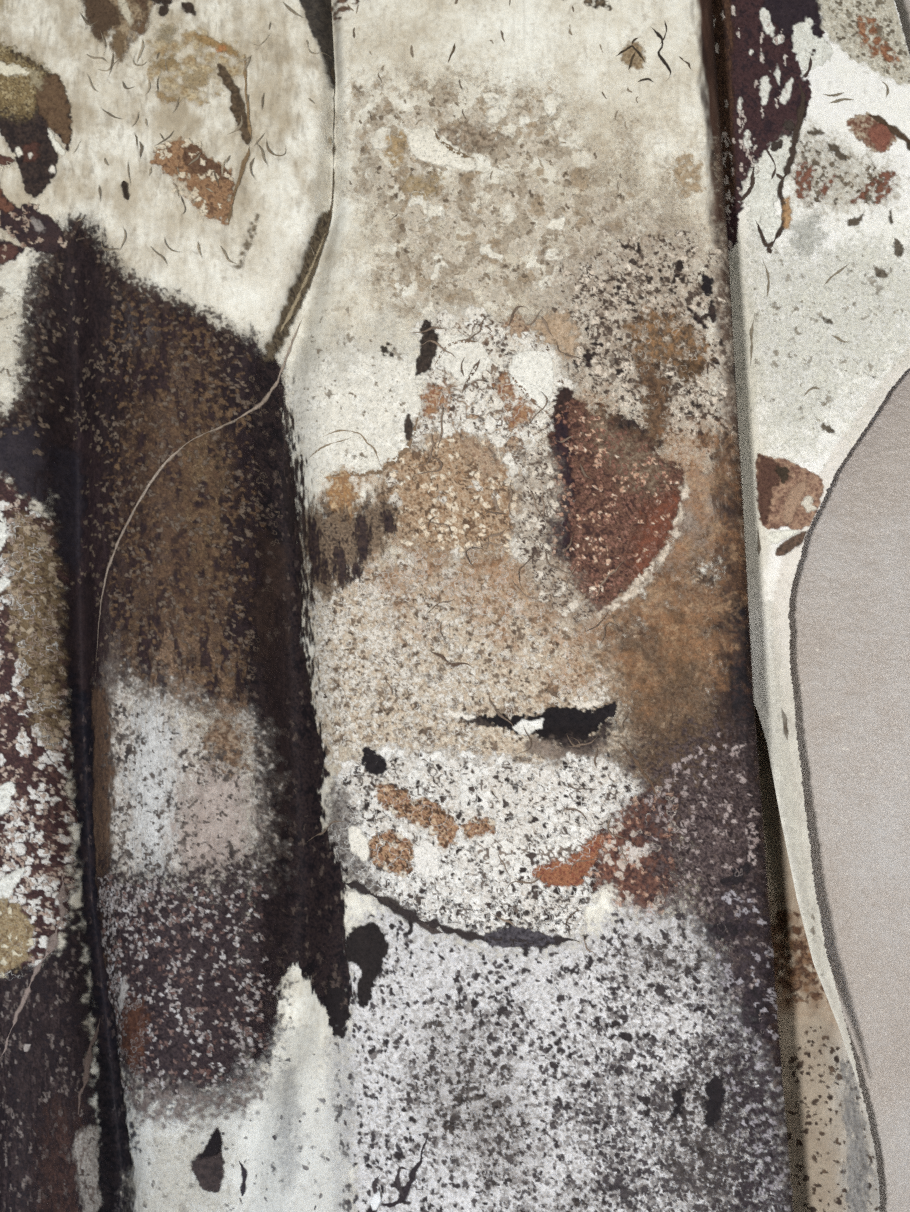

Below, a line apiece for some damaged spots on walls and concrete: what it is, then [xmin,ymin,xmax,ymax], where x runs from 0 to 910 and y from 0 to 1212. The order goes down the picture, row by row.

peeling [0,42,72,265]
crack [410,406,443,474]
crack [412,306,587,376]
peeling [285,0,910,790]
leakage [687,274,716,329]
crack [421,479,577,599]
crack [424,599,472,667]
leakage [0,210,400,1212]
crack [497,711,661,888]
leakage [525,425,828,1212]
crack [343,880,594,953]
crack [369,1133,429,1212]